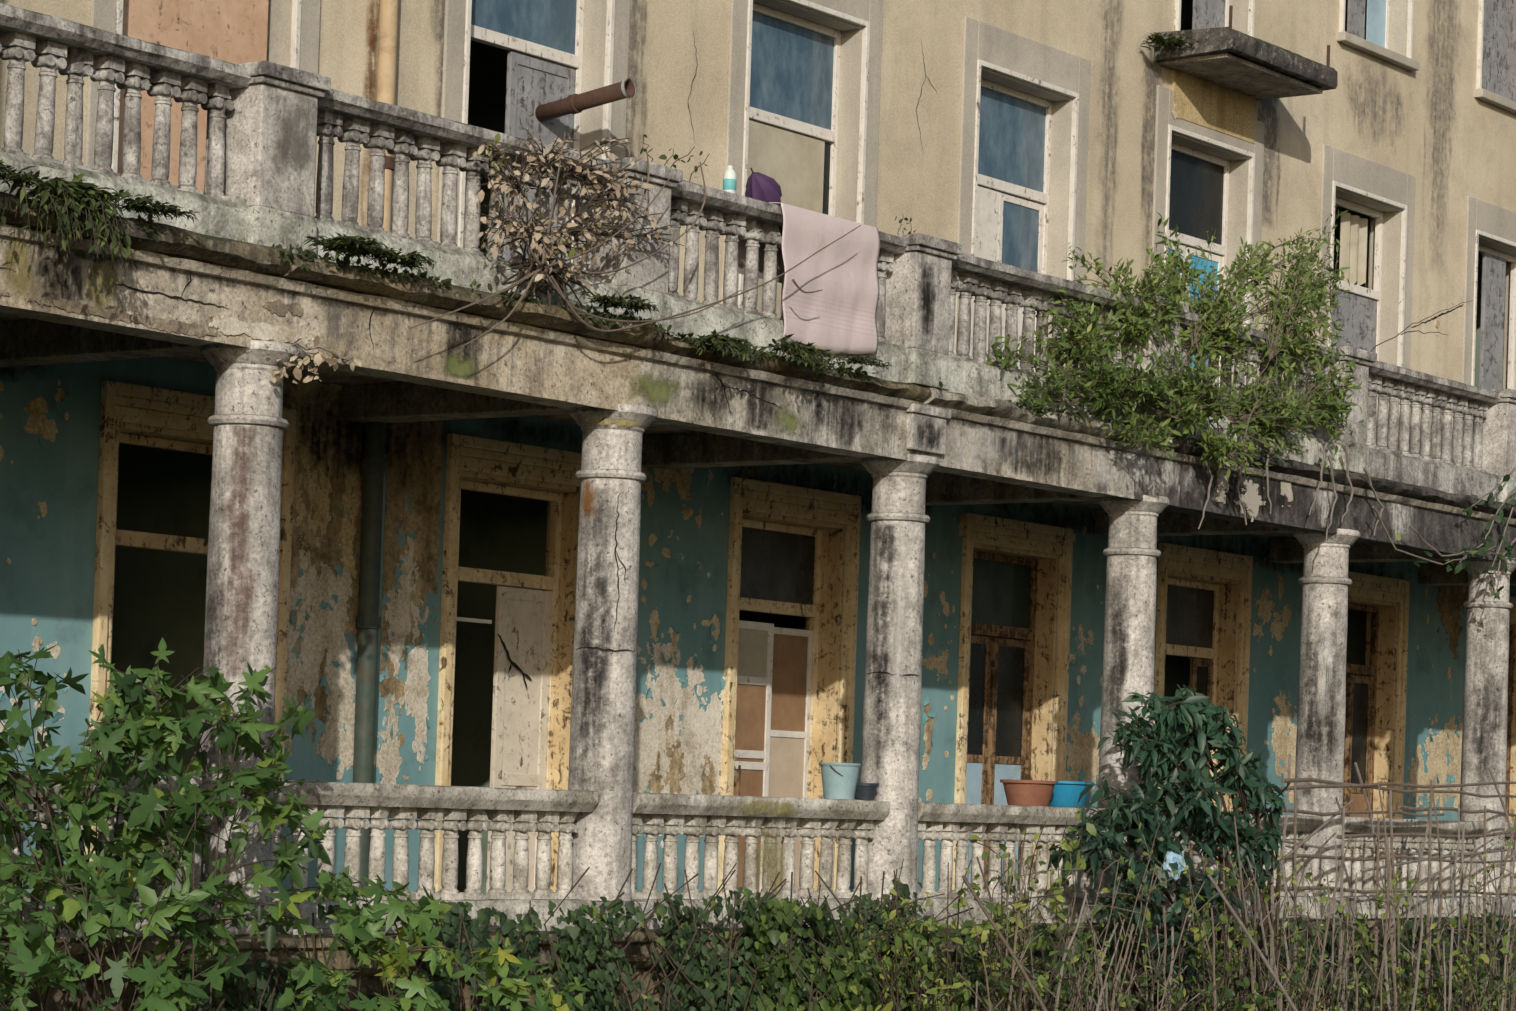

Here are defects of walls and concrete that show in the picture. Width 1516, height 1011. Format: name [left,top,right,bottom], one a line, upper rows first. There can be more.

crack [916,40,937,153]
water stain [187,271,481,365]
water stain [698,372,778,429]
water stain [802,389,907,438]
spalling [1216,440,1295,522]
peeling [283,377,364,781]
peeling [374,420,444,784]
water stain [581,551,606,729]
peeling [633,463,737,795]
water stain [873,526,907,724]
peeling [1251,689,1297,815]
peeling [1407,586,1468,814]